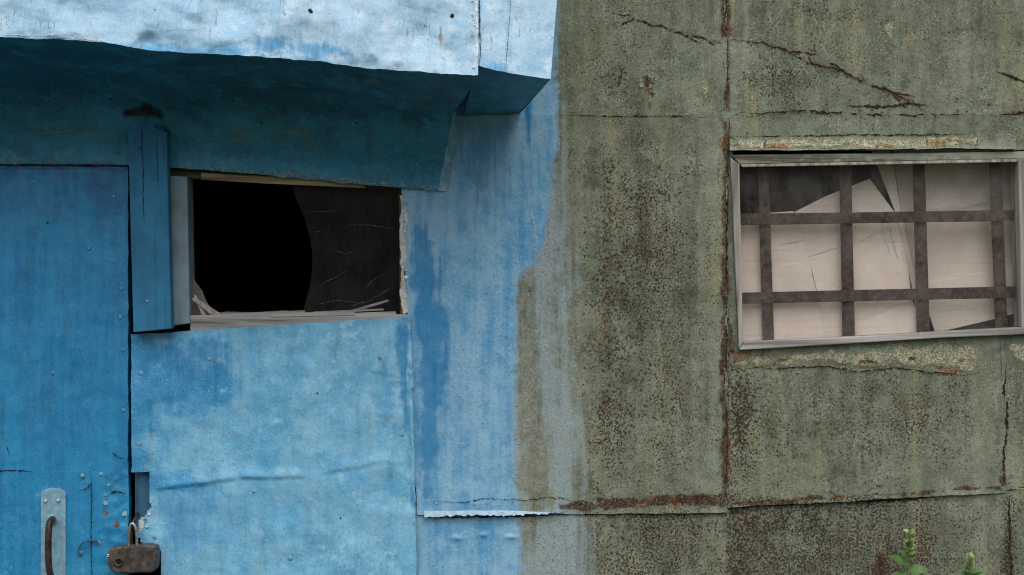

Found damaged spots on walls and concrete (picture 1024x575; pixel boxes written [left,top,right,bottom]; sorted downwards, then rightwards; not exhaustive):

corrosion [553,0,977,515]
crack [613,13,926,111]